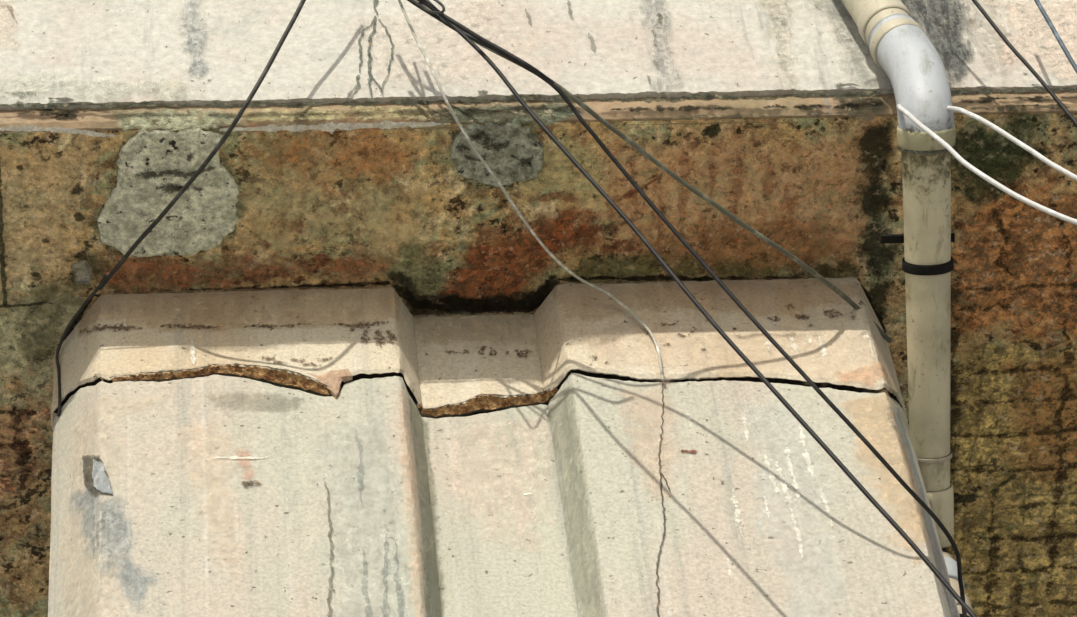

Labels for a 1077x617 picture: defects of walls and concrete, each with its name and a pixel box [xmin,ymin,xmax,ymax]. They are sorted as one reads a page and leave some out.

crack [346,0,394,101]
damp [901,0,976,82]
corrosion [437,191,641,299]
damp [76,490,148,599]
crack [0,363,902,617]
efflorescence [763,427,814,557]